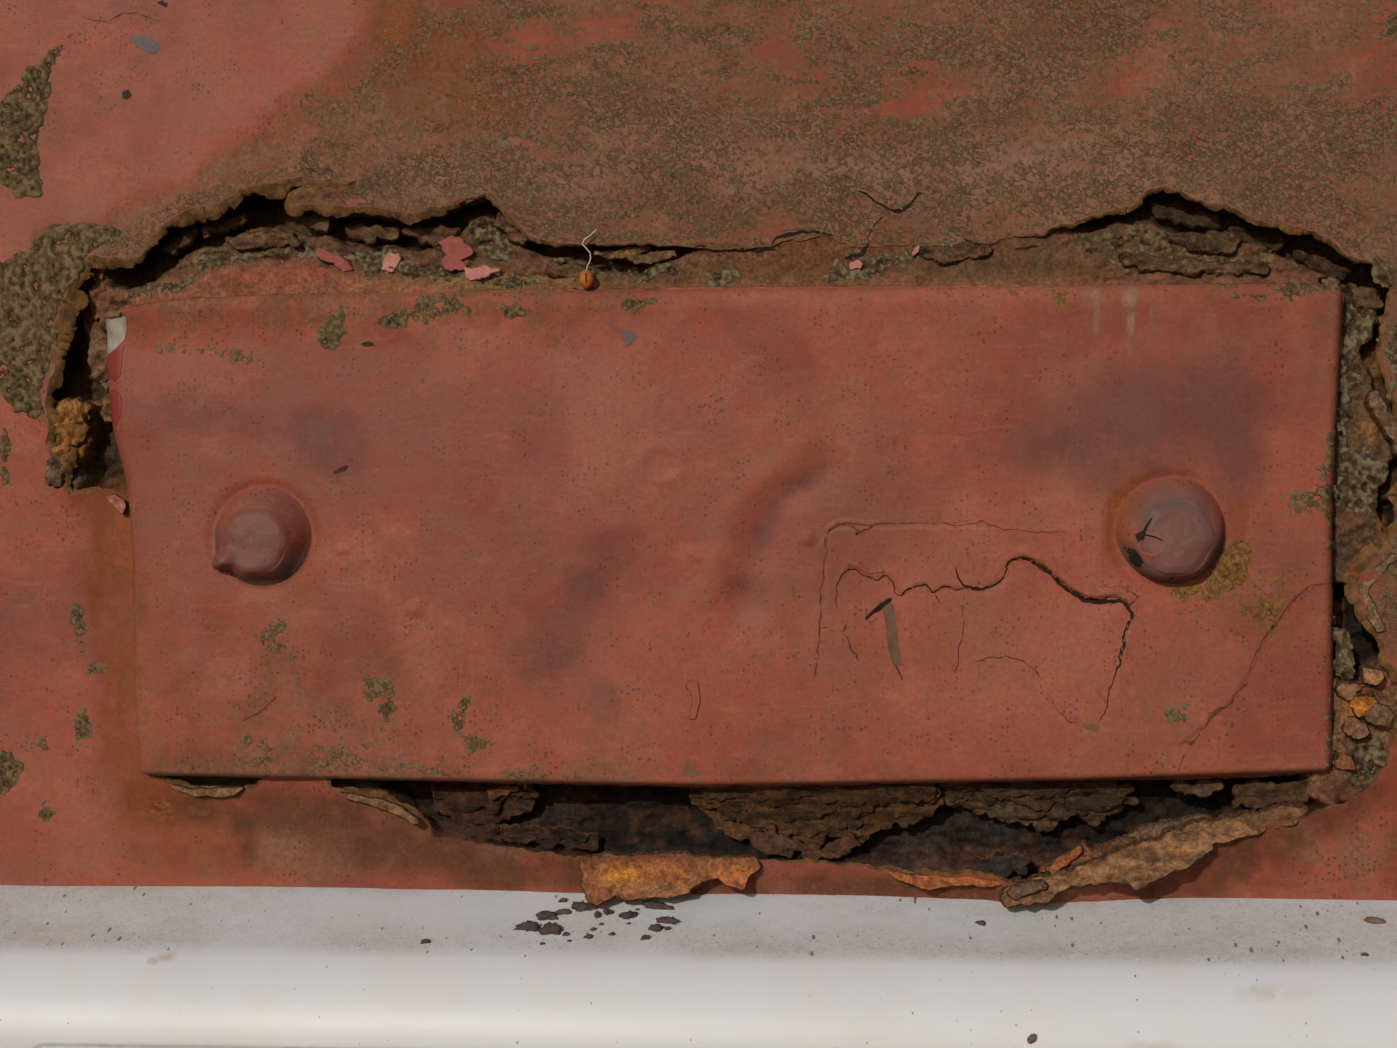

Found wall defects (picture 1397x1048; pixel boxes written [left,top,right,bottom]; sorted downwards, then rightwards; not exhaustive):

spalling [44,218,1329,515]
spalling [331,294,1397,908]
spalling [162,776,260,798]